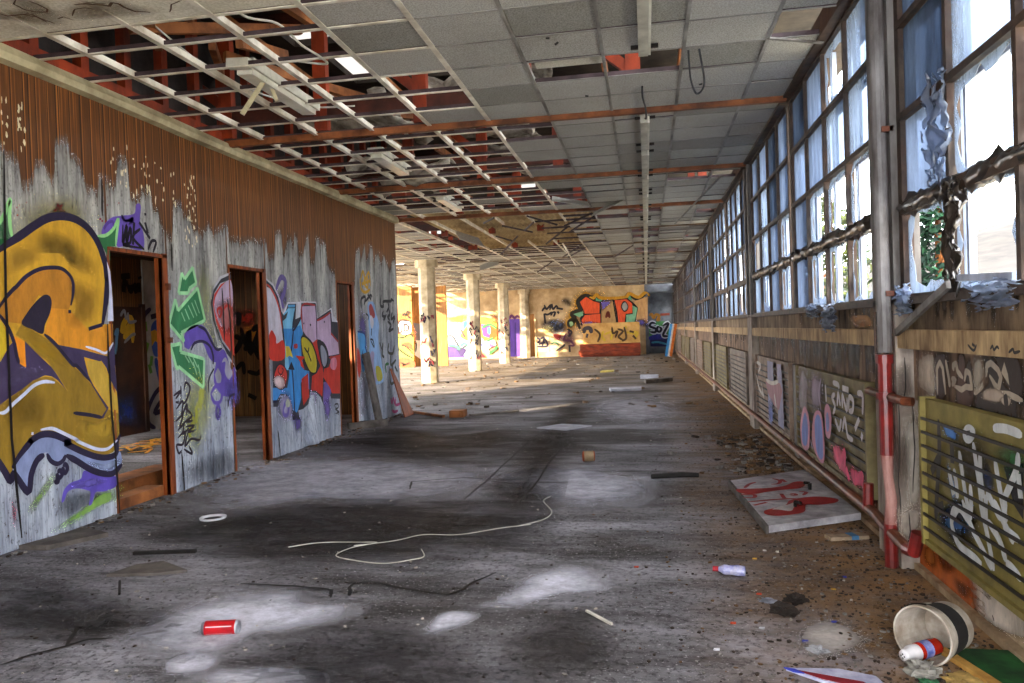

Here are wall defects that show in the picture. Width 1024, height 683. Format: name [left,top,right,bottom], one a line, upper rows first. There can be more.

peeling [0,96,341,493]
peeling [354,246,401,421]
peeling [0,452,117,555]
crack [409,431,565,502]